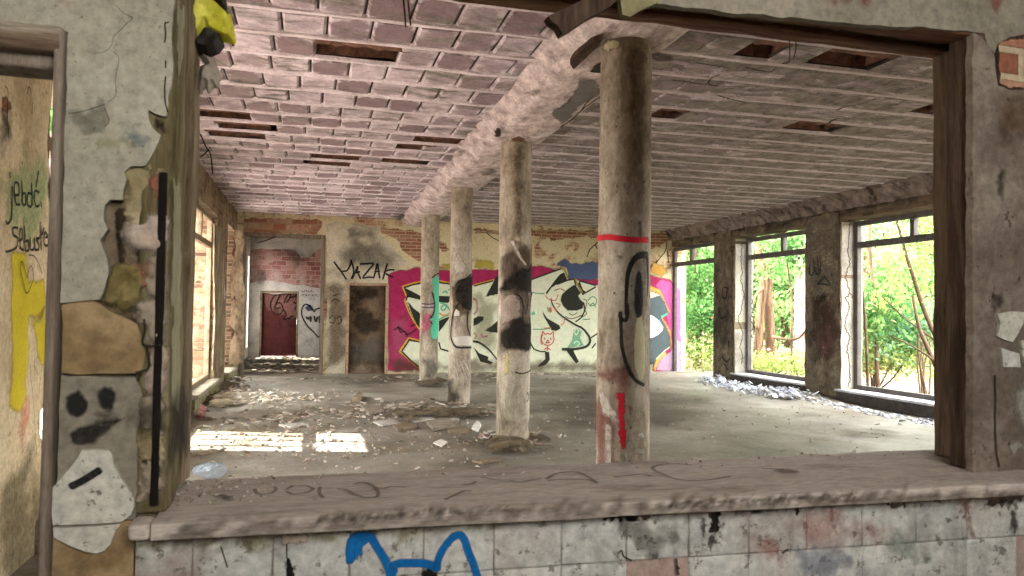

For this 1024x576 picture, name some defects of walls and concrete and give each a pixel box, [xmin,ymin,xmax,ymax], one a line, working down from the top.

peeling [177,0,185,77]
flaking render [998,39,1024,88]
peeling [52,165,182,576]
peeling [211,217,422,374]